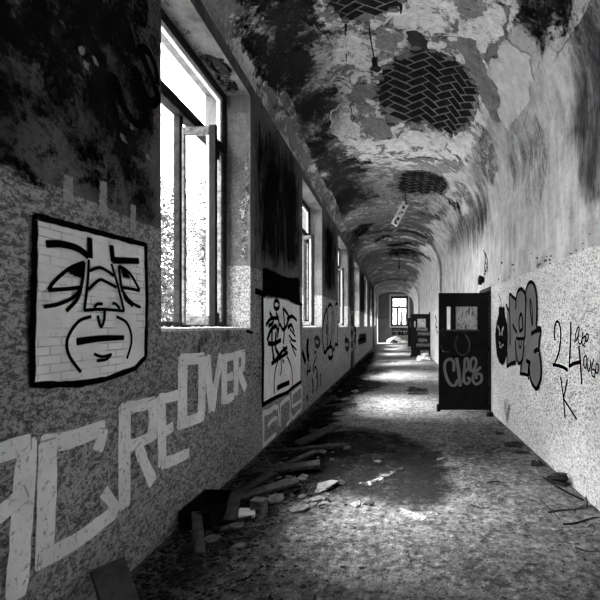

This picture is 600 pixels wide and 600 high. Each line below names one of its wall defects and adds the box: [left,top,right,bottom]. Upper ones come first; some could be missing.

damp [0,0,162,223]
peeling [173,17,239,93]
damp [254,112,301,270]
damp [253,0,375,211]
flaking render [235,0,534,232]
damp [504,0,600,204]